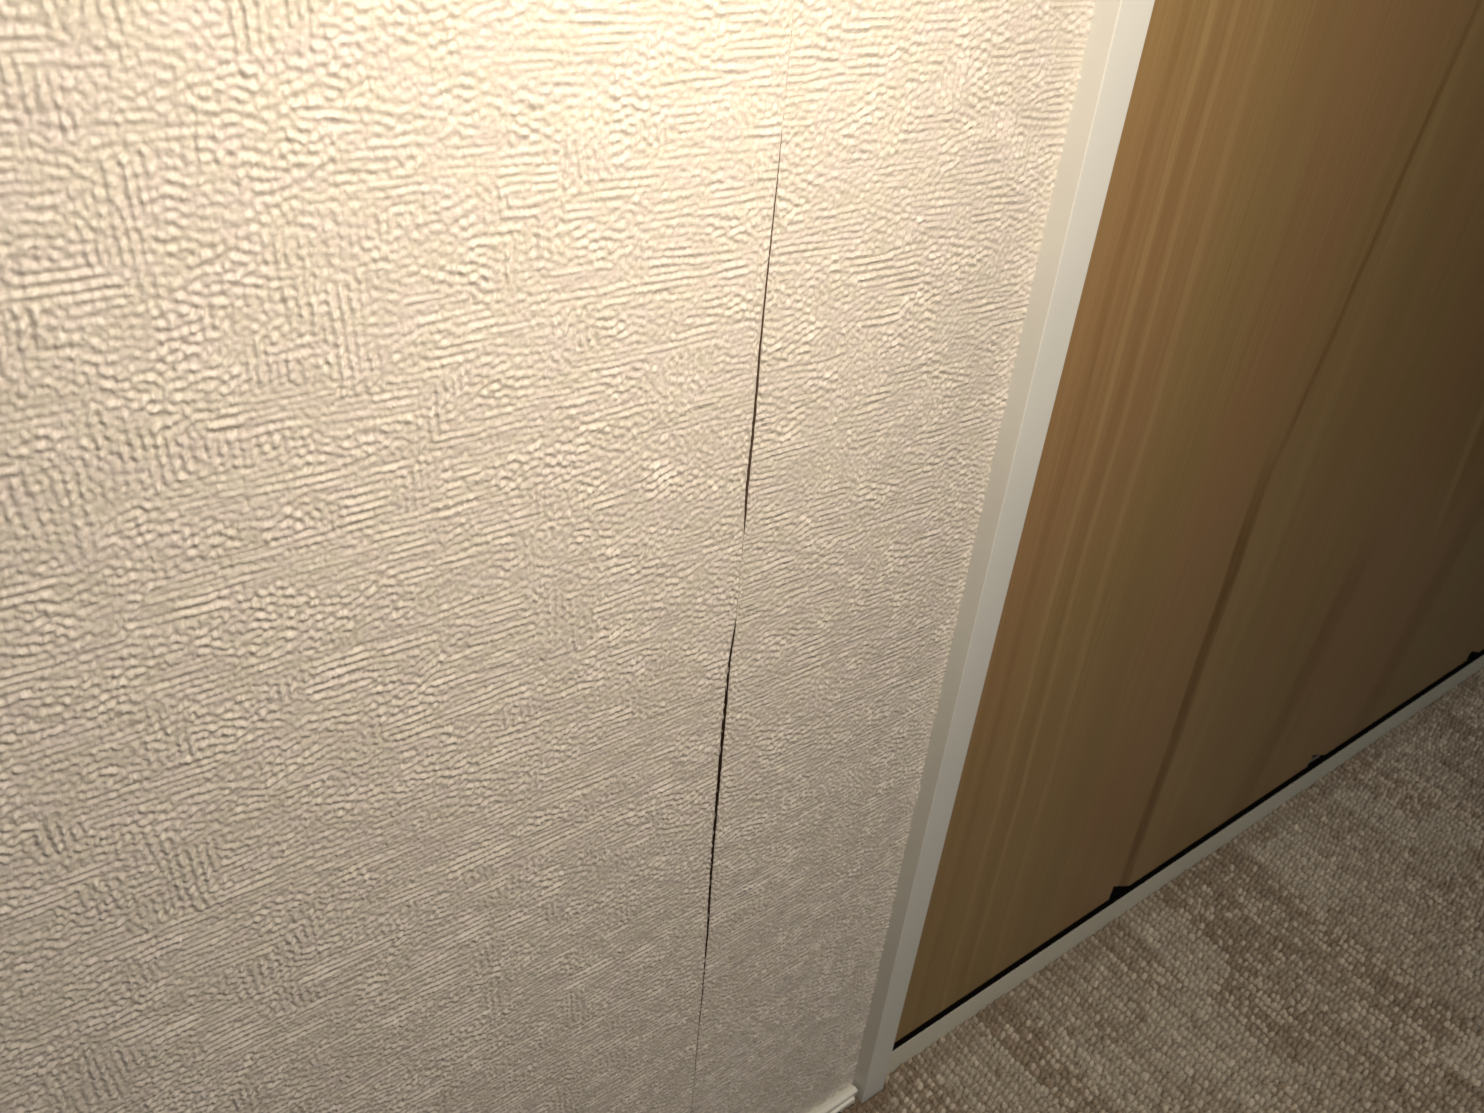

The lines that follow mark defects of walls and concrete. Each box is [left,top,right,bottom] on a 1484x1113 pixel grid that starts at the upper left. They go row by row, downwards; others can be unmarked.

crack [691,0,795,1110]